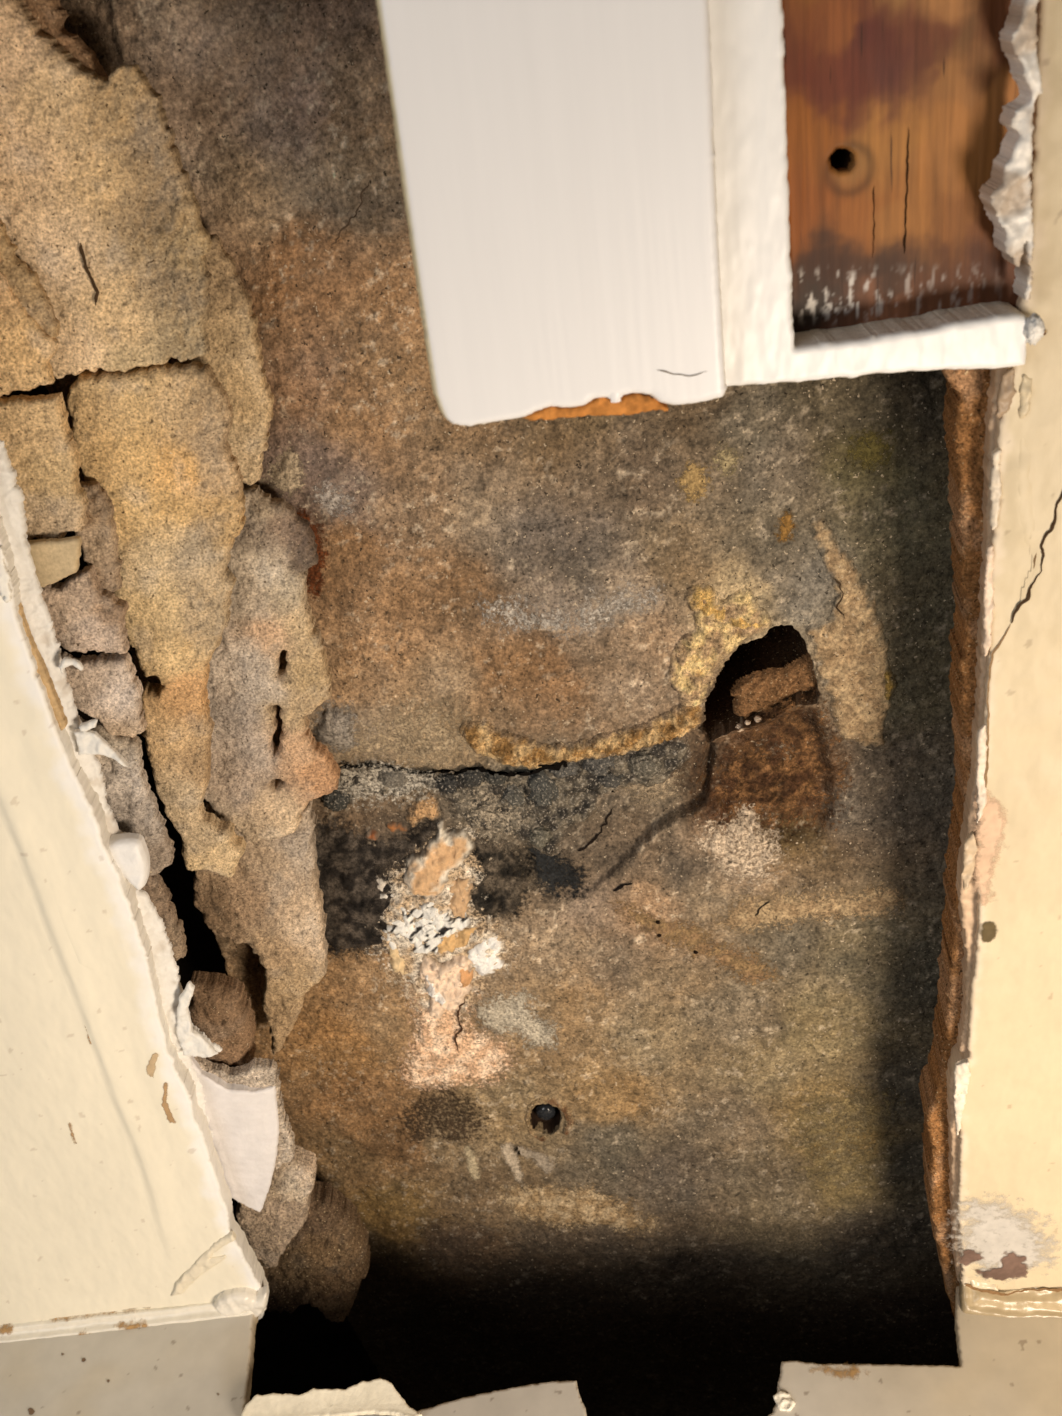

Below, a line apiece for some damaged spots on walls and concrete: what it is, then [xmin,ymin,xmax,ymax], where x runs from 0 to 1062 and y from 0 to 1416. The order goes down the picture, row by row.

peeling [74,719,129,767]
water stain [313,574,772,961]
spalling [704,625,817,741]
peeling [961,724,988,890]
peeling [982,447,1002,656]
crack [984,439,1062,790]
water stain [609,802,908,986]
peeling [176,981,296,1212]
water stain [392,1082,494,1151]
water stain [470,987,561,1050]
water stain [495,1180,661,1238]
peeling [241,1378,422,1416]